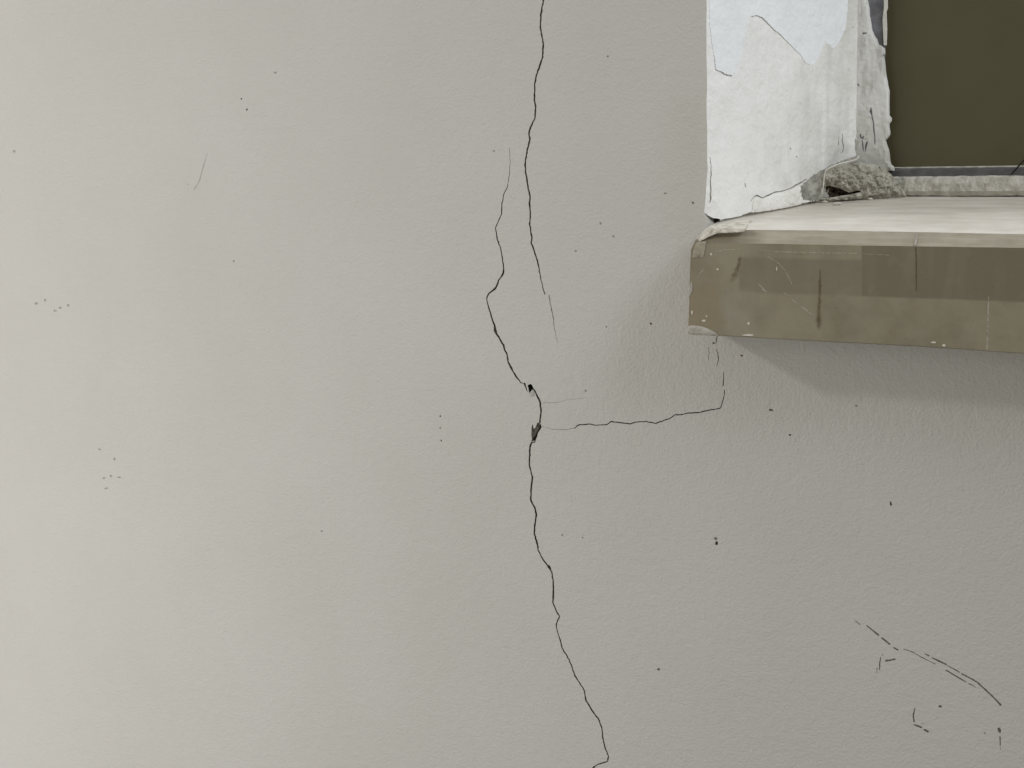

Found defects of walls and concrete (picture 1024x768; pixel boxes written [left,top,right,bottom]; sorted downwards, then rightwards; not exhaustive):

peeling [709,0,867,76]
spalling [752,108,907,213]
crack [486,0,725,768]